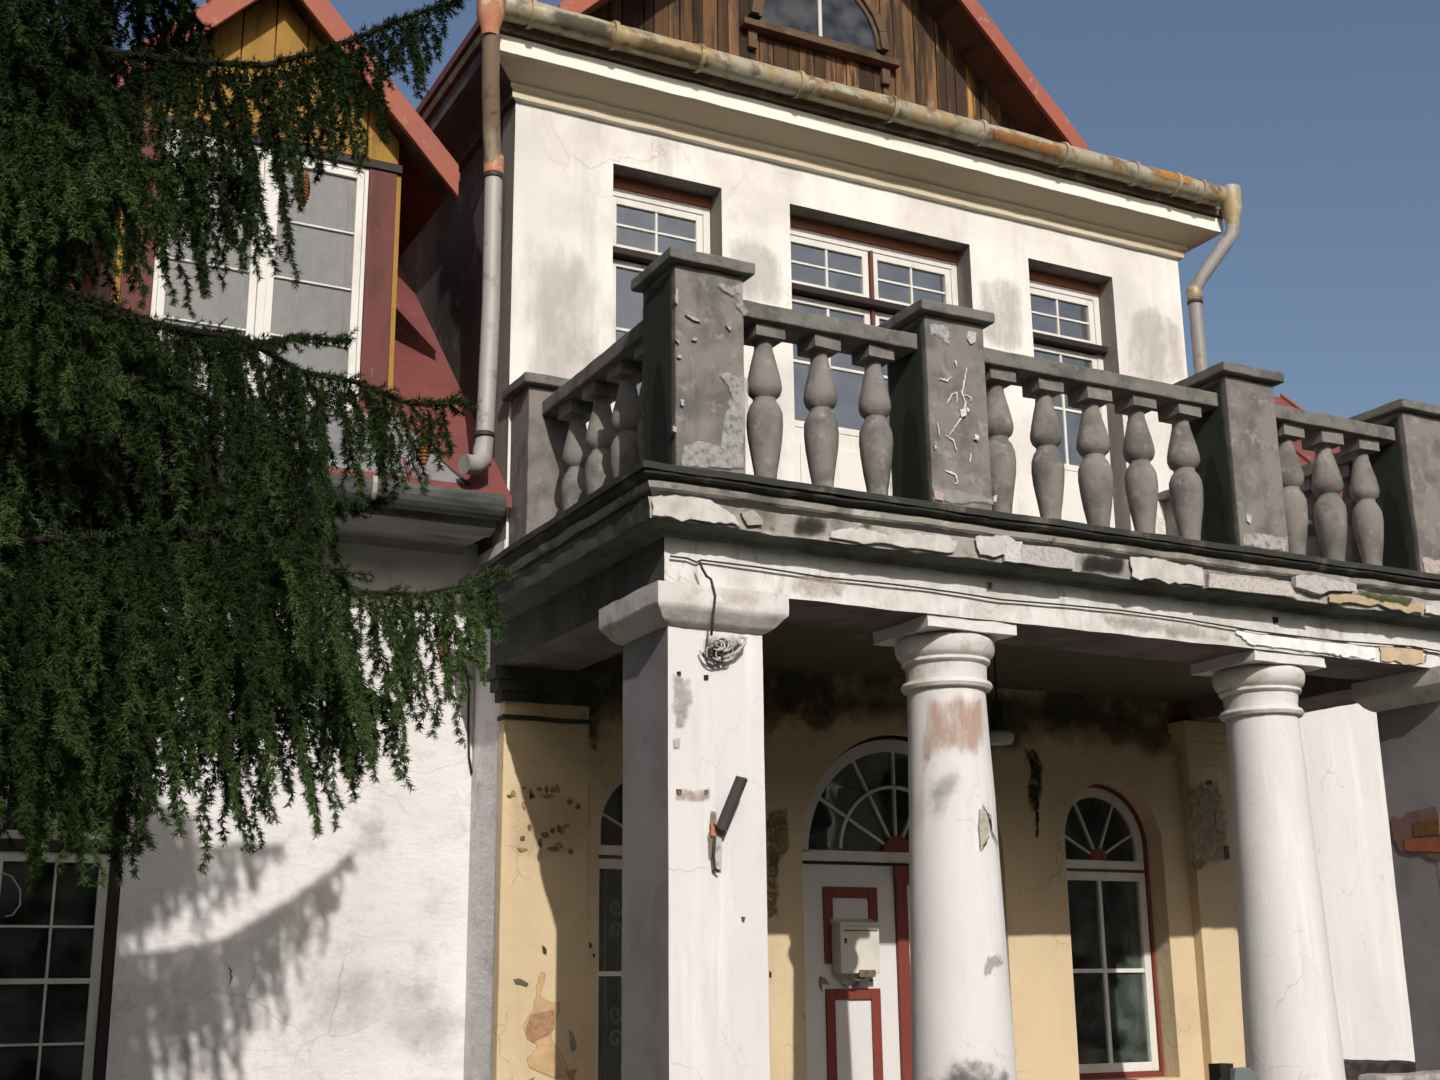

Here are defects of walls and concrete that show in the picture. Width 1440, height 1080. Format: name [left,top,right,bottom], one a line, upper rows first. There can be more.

rust [991,128,1062,156]
rust [1151,167,1192,184]
peeling [672,372,749,469]
crack [933,360,979,484]
peeling [830,527,958,553]
peeling [976,535,1077,570]
peeling [1130,557,1440,615]
peeling [1236,617,1440,665]
water stain [578,655,623,749]
water stain [763,667,907,729]
water stain [986,691,1143,837]
spalling [1391,807,1440,862]